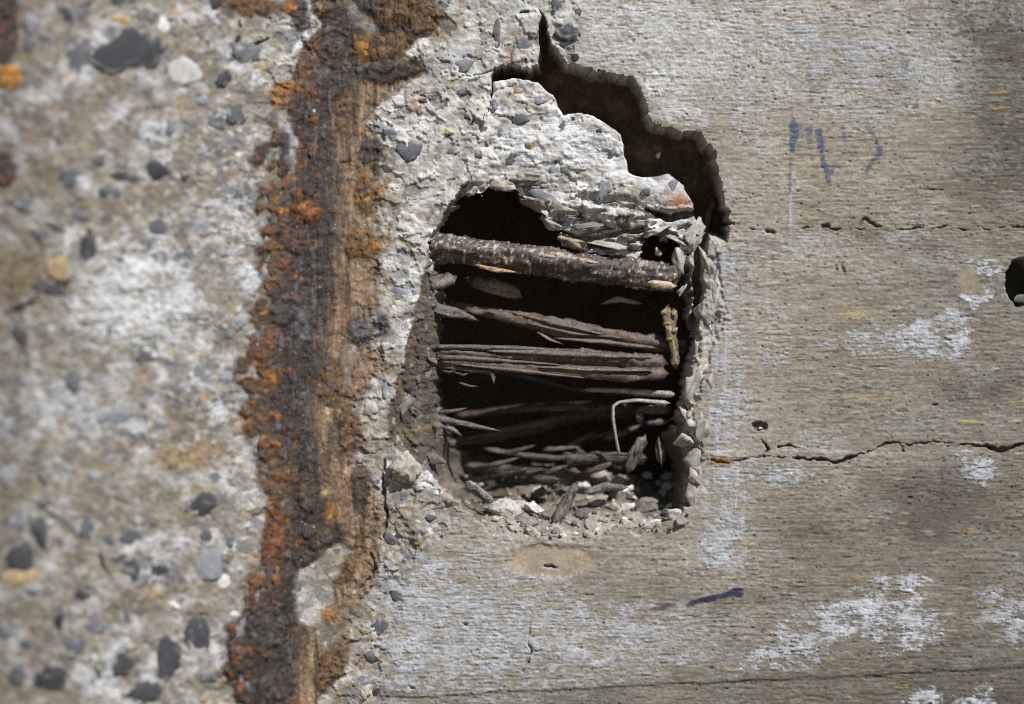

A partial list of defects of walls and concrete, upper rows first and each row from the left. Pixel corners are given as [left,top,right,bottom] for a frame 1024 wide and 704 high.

rust [428,233,683,292]
spalling [0,0,384,704]
rust [217,0,443,704]
spalling [291,0,730,704]
rust [452,401,677,447]
crack [707,439,1024,465]
efflorescence [739,573,946,671]
efflorescence [973,590,1024,643]
efflorescence [902,686,939,704]
efflorescence [955,687,996,704]